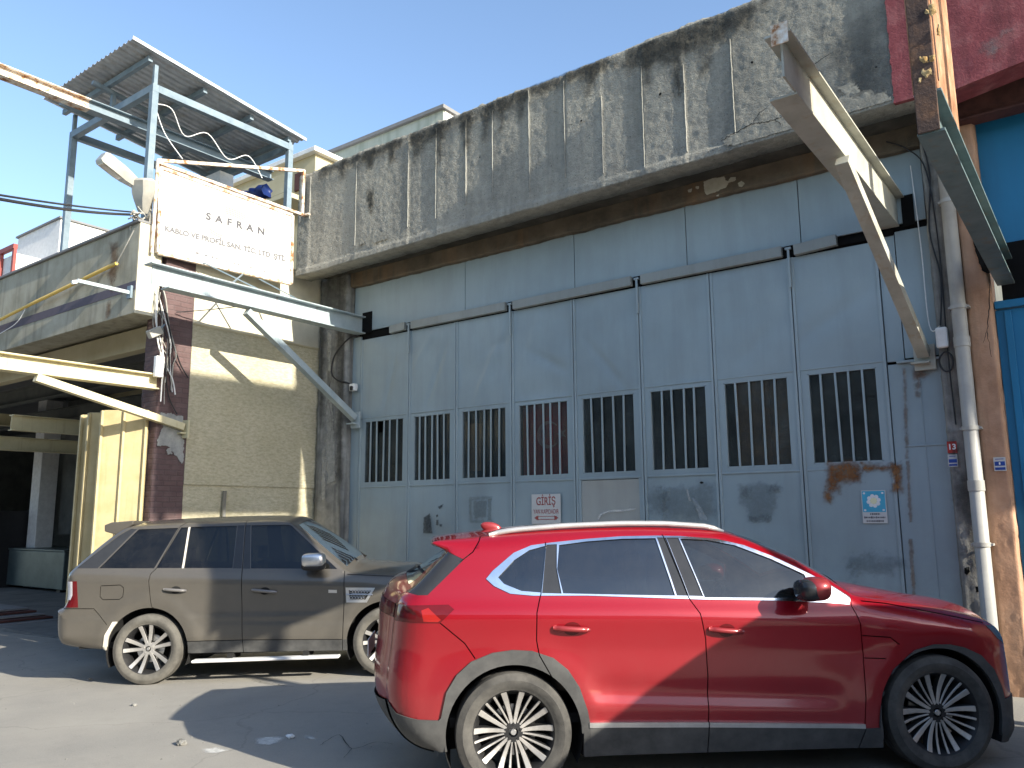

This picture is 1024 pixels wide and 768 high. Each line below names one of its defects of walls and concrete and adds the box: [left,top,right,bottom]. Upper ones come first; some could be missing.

leakage [319,4,755,176]
peeling [688,176,745,197]
peeling [157,413,184,464]
corrosion [825,462,911,522]